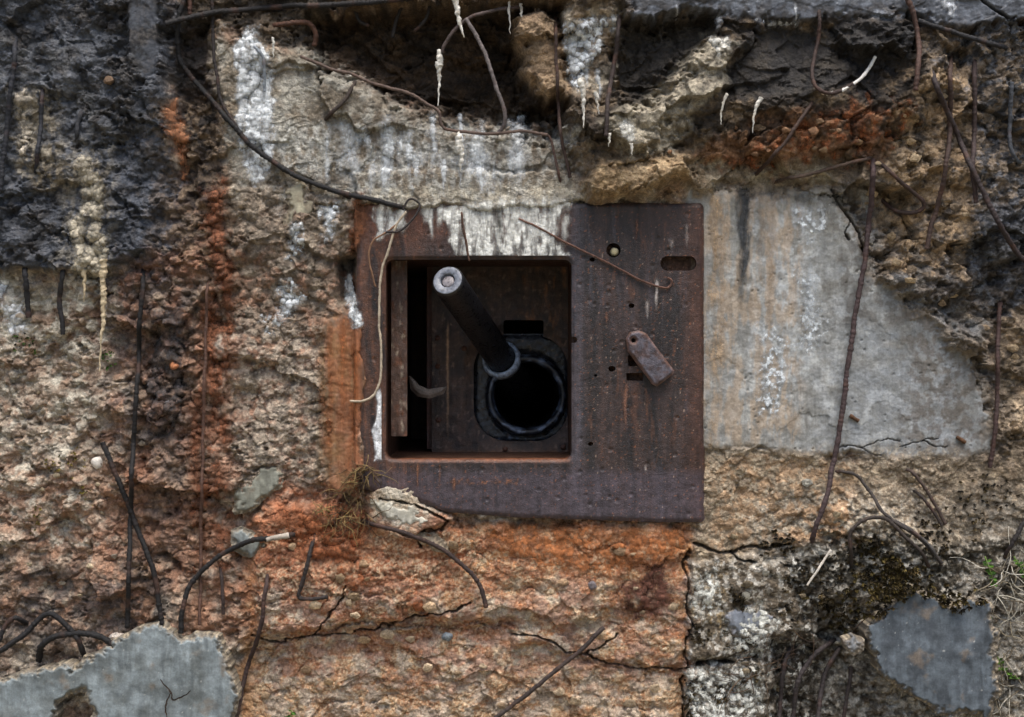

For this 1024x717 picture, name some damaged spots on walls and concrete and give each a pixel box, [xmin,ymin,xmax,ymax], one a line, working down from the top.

corrosion [165,98,189,181]
efflorescence [430,114,495,185]
efflorescence [69,156,109,285]
efflorescence [376,205,405,240]
efflorescence [423,198,570,255]
corrosion [189,177,235,574]
spalling [318,0,1024,717]
spalling [0,255,1002,717]
crack [839,438,948,457]
crack [251,585,471,644]
corrosion [487,523,687,620]
crack [512,542,791,717]